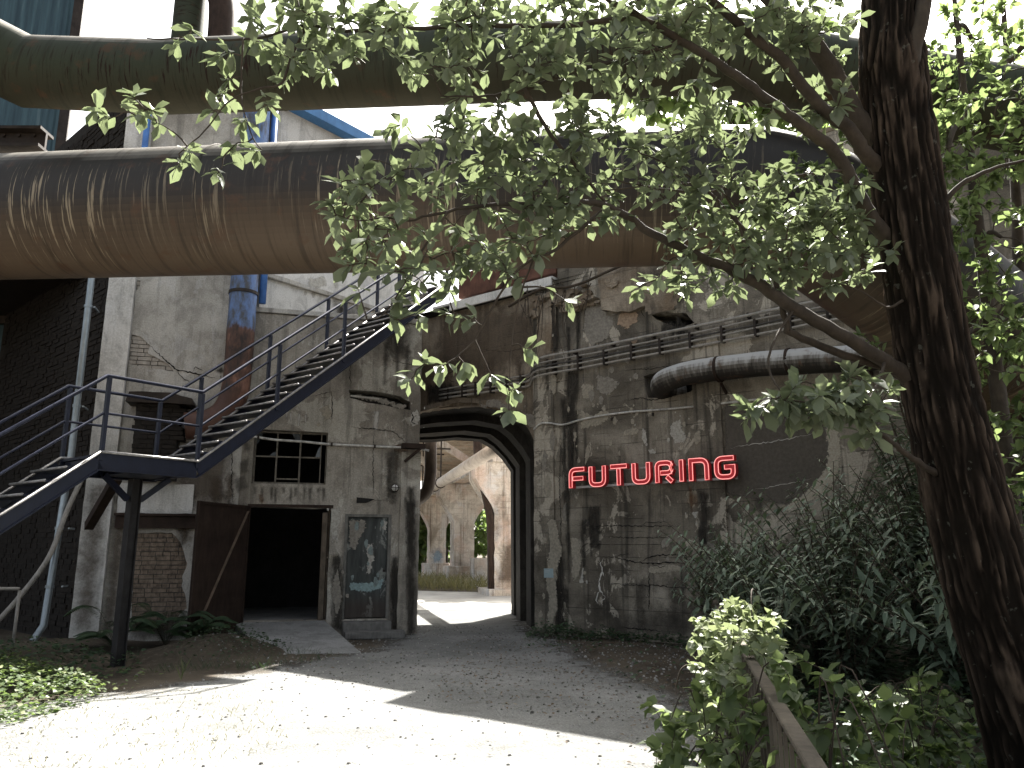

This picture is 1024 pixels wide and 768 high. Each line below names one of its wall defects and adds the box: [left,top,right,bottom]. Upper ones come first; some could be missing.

flaking render [129,335,173,371]
crack [152,347,215,381]
peeling [582,306,638,352]
leakage [546,302,600,631]
flaking render [132,532,187,632]
peeling [326,507,384,617]
leakage [388,451,416,635]